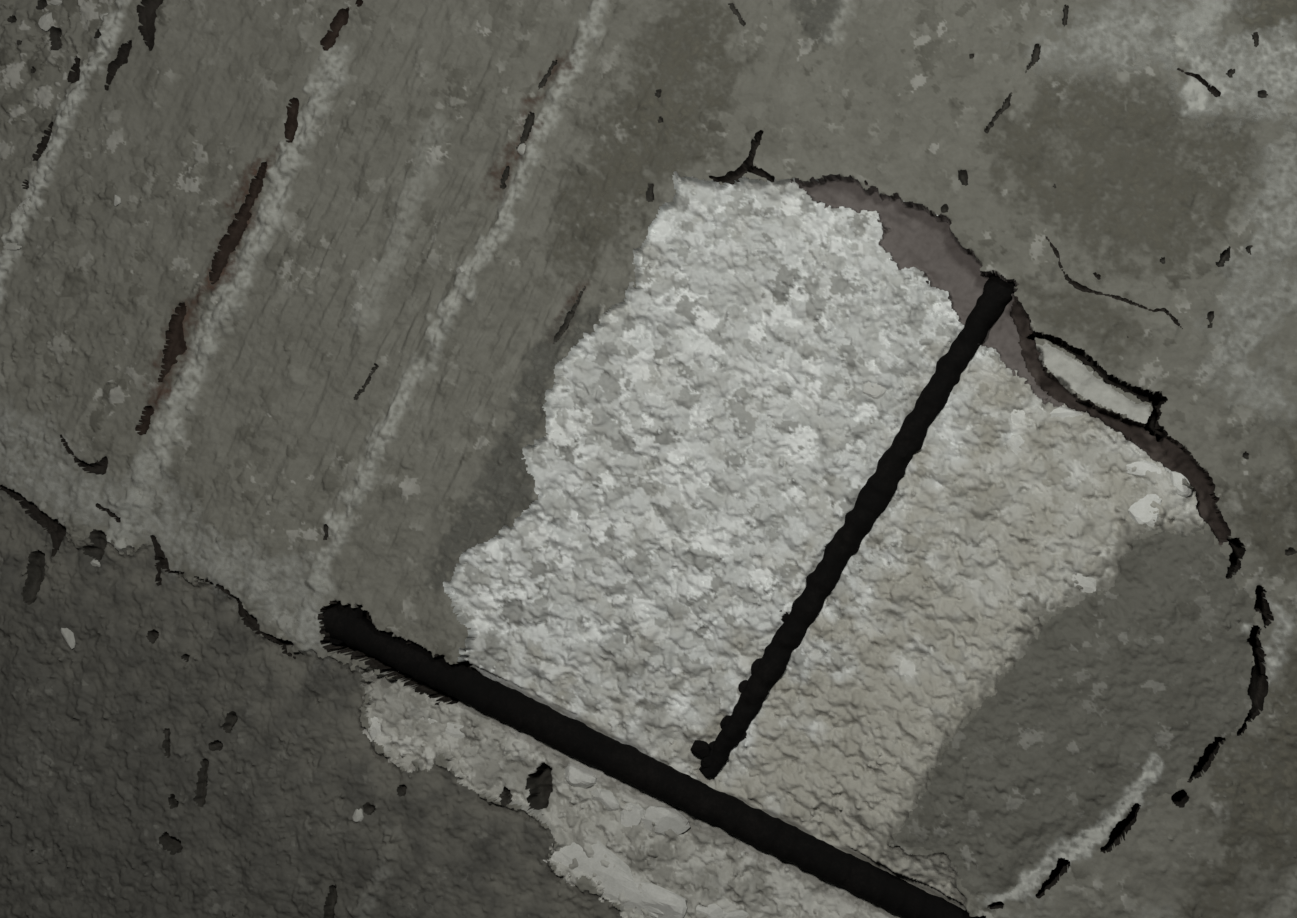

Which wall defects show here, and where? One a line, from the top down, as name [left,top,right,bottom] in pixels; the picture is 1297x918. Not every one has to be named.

spalling [728,3,746,26]
damp [554,2,737,273]
crack [709,130,775,185]
spalling [1215,245,1253,267]
damp [431,307,600,586]
crack [0,484,66,558]
damp [1,415,322,647]
crack [150,535,296,659]
spalling [0,170,1206,918]
crack [1010,296,1274,808]
crack [1035,858,1070,899]
crack [1100,803,1141,854]